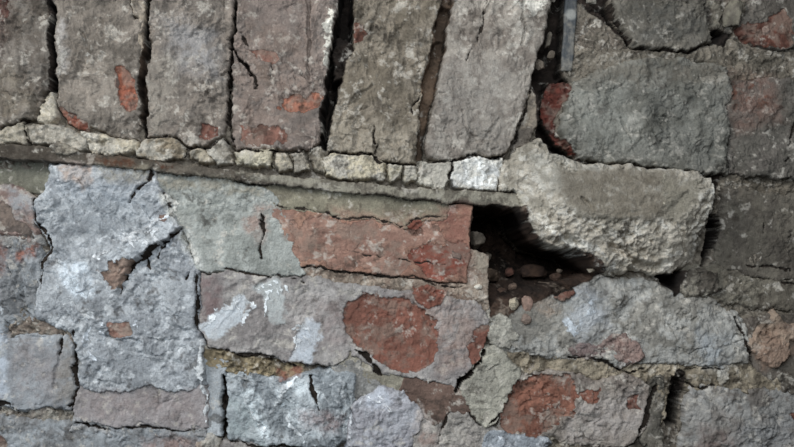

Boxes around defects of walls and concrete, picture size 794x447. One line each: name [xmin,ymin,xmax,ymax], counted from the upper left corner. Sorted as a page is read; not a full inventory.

crack [163,0,531,179]
crack [224,205,462,288]
spalling [288,204,606,447]